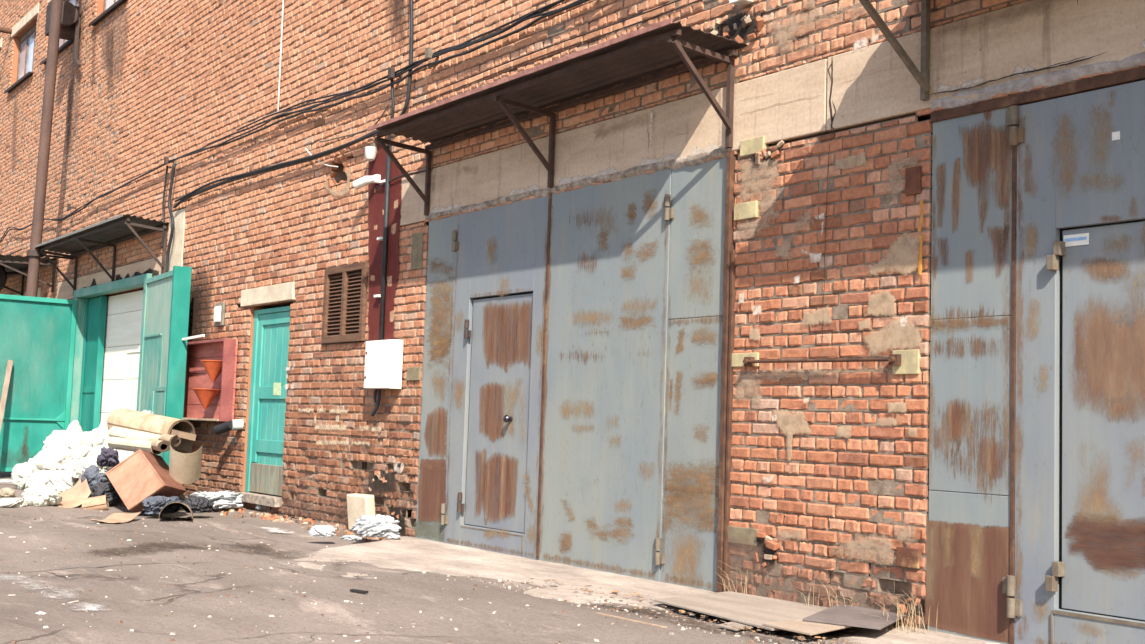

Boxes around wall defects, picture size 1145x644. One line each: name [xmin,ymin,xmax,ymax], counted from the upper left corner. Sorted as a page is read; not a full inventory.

crack [929,51,1108,95]
crack [744,59,905,349]
rust [1087,260,1128,281]
rust [414,261,472,545]
rust [475,281,547,434]
rust [561,304,653,361]
rust [928,296,1036,364]
rust [1076,301,1145,417]
rust [476,382,543,552]
rust [518,529,652,577]
rust [925,512,1022,643]
rust [1066,480,1145,573]